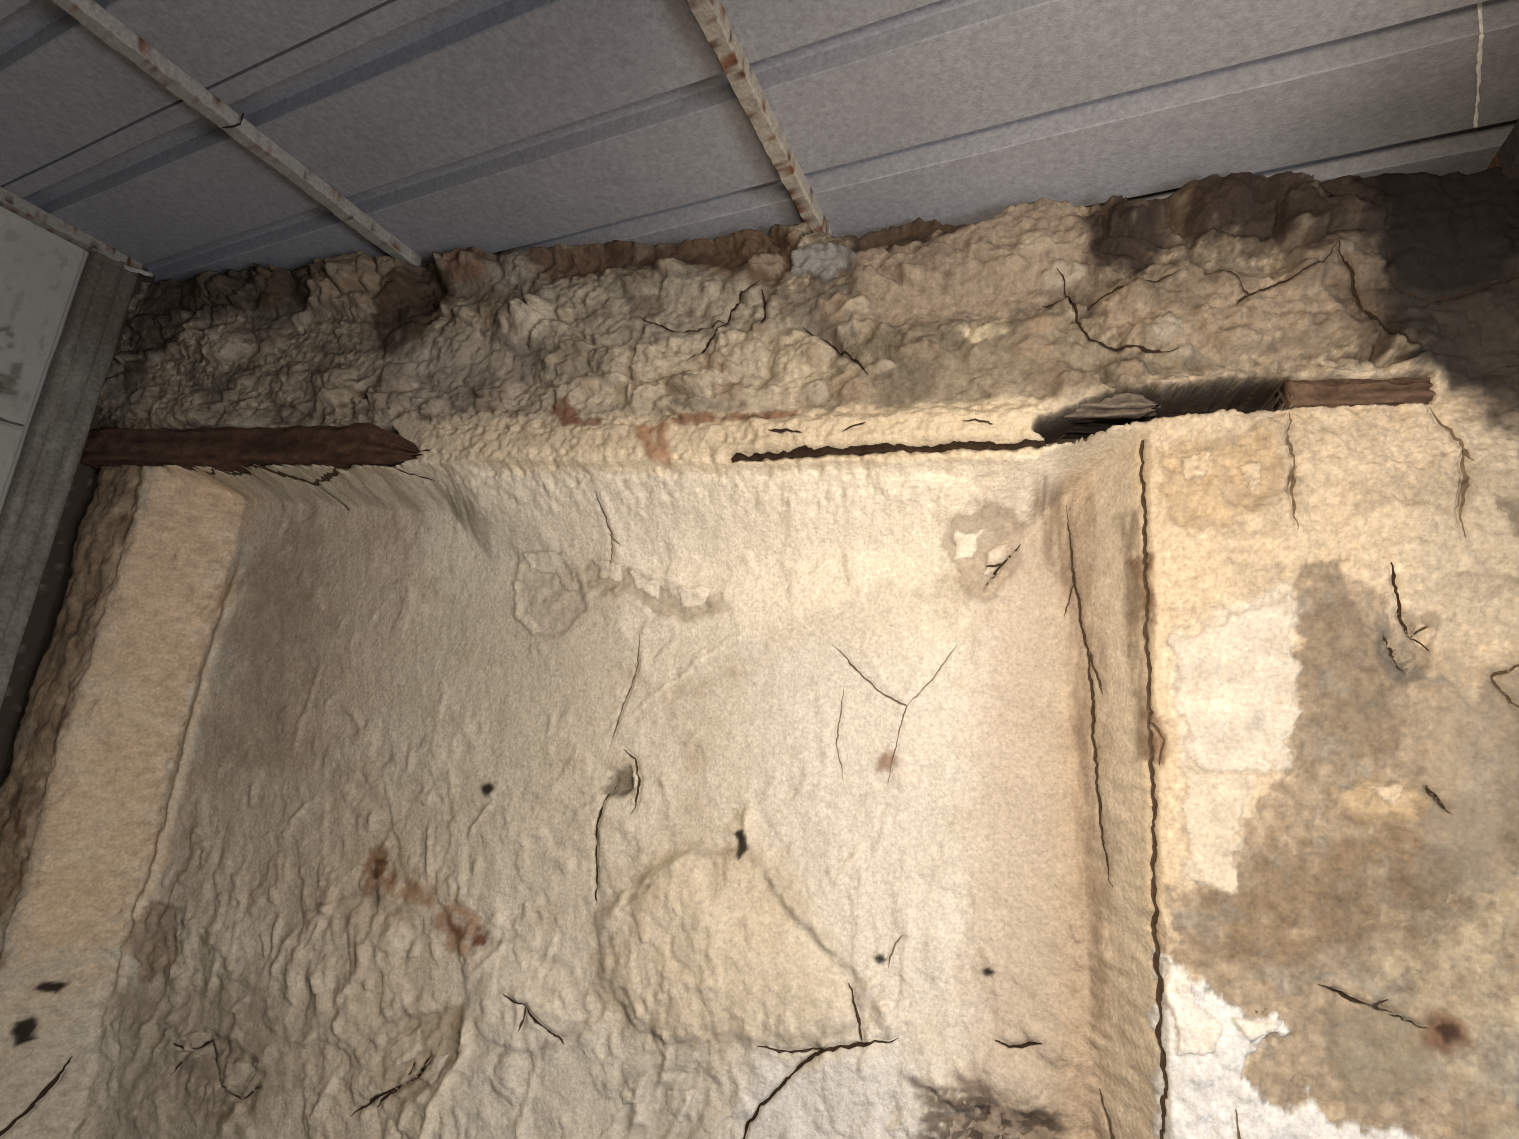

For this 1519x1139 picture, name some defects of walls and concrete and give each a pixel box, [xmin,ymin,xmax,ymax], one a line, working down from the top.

crack [1042,241,1426,353]
crack [731,418,1046,462]
crack [1383,562,1429,674]
crack [1064,505,1113,887]
crack [1139,440,1168,1139]
corrosion [365,848,391,888]
peeling [1146,561,1519,1139]
corrosion [436,904,486,954]
crack [743,983,898,1139]
leakage [912,1079,1062,1139]
leakage [1333,1009,1415,1098]
corrosion [1424,1016,1467,1051]